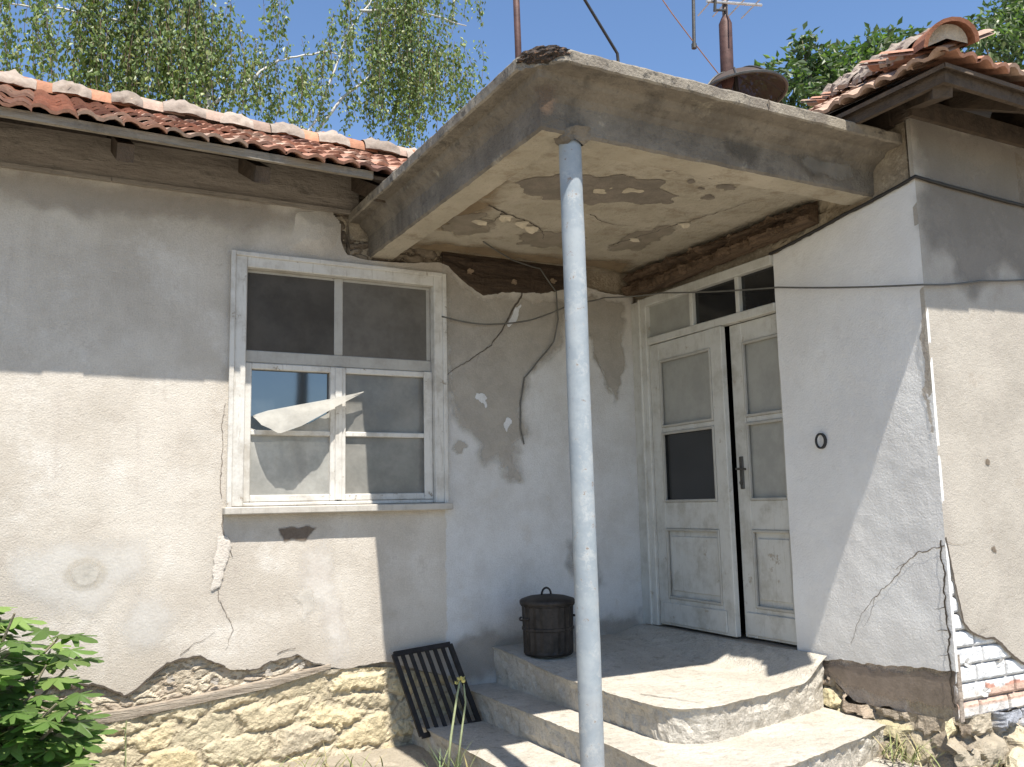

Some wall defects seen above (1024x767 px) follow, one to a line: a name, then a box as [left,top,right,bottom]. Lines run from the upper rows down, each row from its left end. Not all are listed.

spalling [516,45,571,64]
peeling [516,174,561,200]
peeling [582,175,677,205]
peeling [333,213,565,481]
crack [71,406,324,697]
crack [851,537,1024,708]
flaking render [950,571,1024,723]
flaking render [29,656,315,715]
flaking render [823,659,922,715]